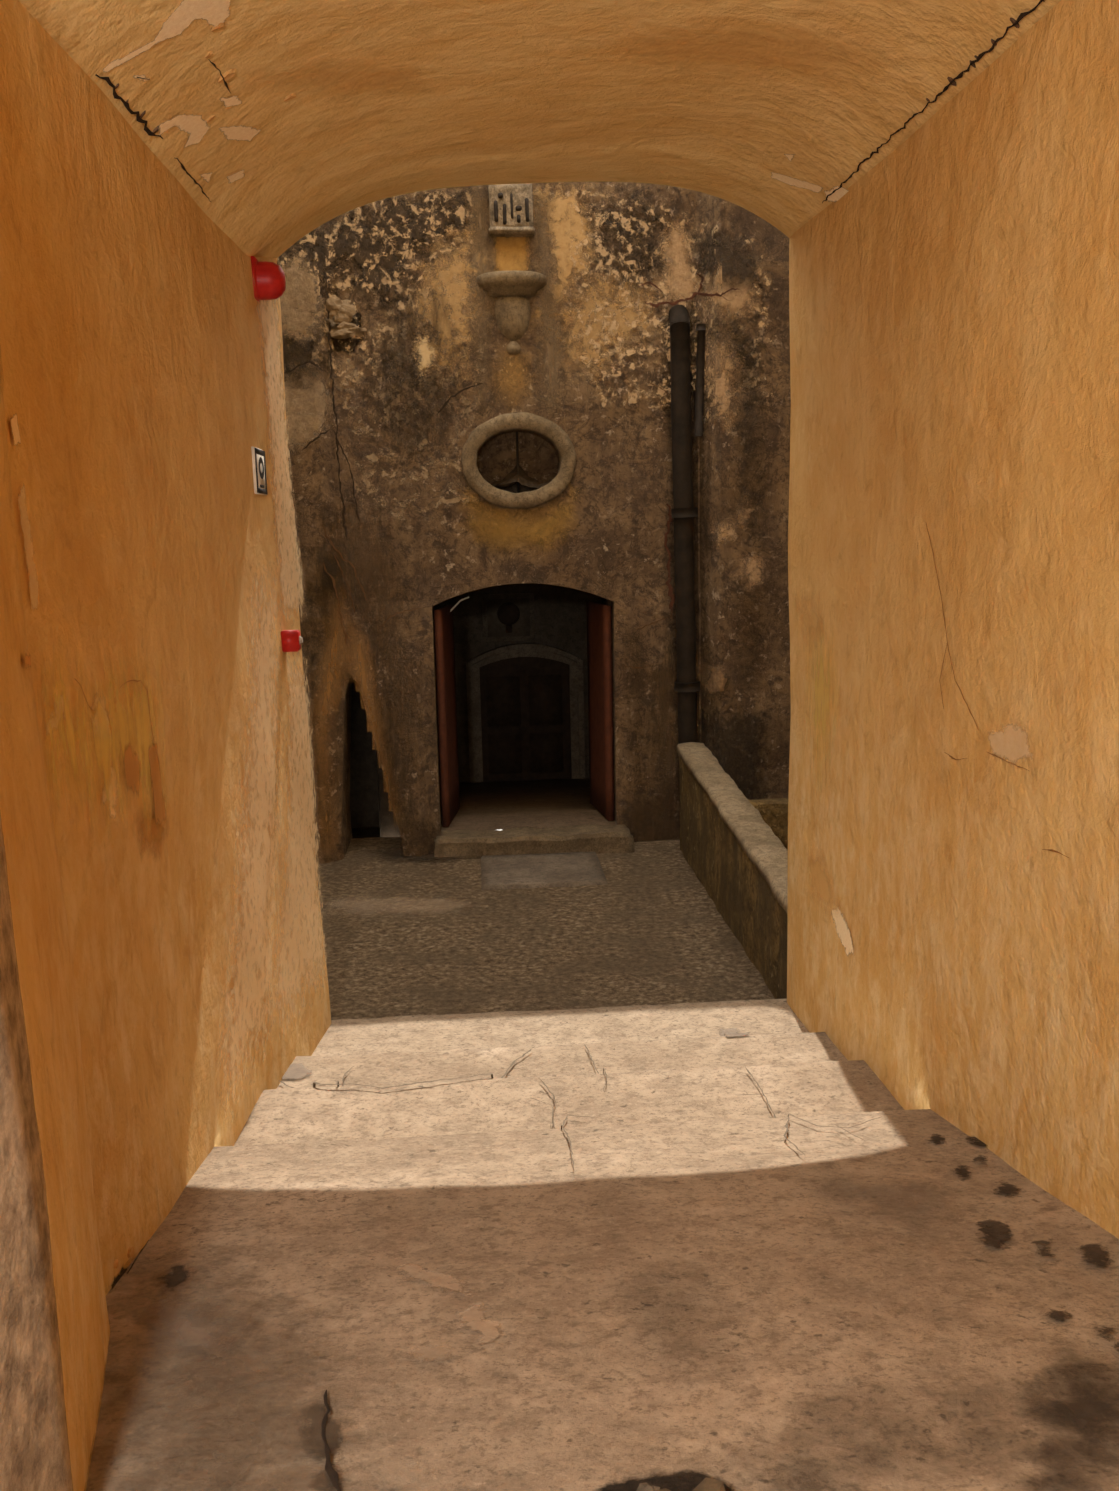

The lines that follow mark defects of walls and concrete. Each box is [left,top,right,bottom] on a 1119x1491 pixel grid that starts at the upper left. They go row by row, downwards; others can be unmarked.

peeling [103,0,231,81]
peeling [158,69,261,148]
crack [822,0,1045,203]
water stain [277,187,491,861]
water stain [533,191,774,842]
crack [301,1390,343,1491]
spalling [596,1470,734,1491]
water stain [1027,1362,1119,1490]